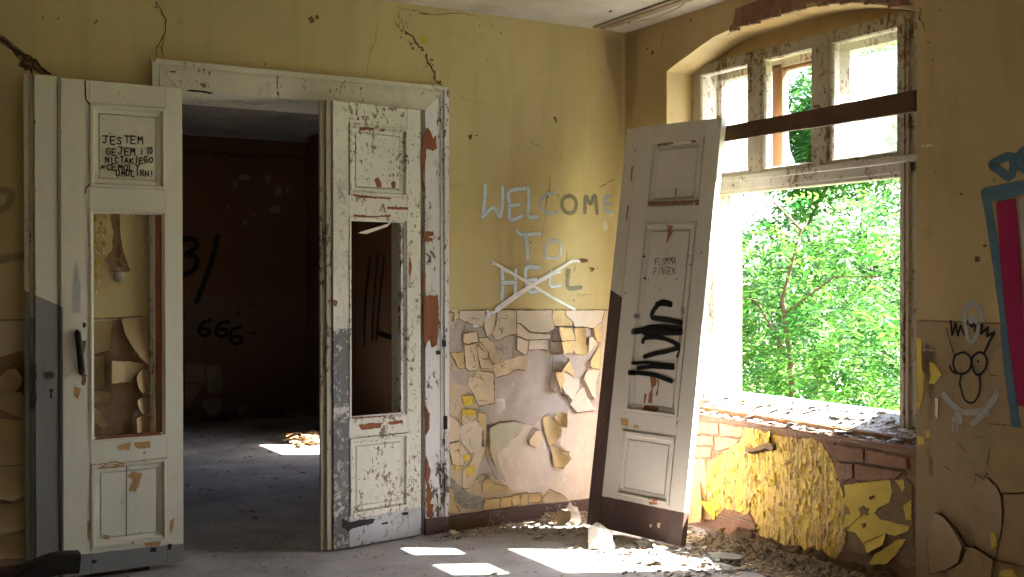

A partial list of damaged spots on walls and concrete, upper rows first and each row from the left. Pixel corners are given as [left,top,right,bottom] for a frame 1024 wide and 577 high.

crack [0,35,51,75]
crack [151,2,167,54]
crack [366,7,480,100]
spalling [604,0,913,37]
peeling [0,350,25,560]
peeling [94,315,150,437]
flaking render [422,273,606,526]
peeling [688,411,914,565]
crack [935,340,1021,571]